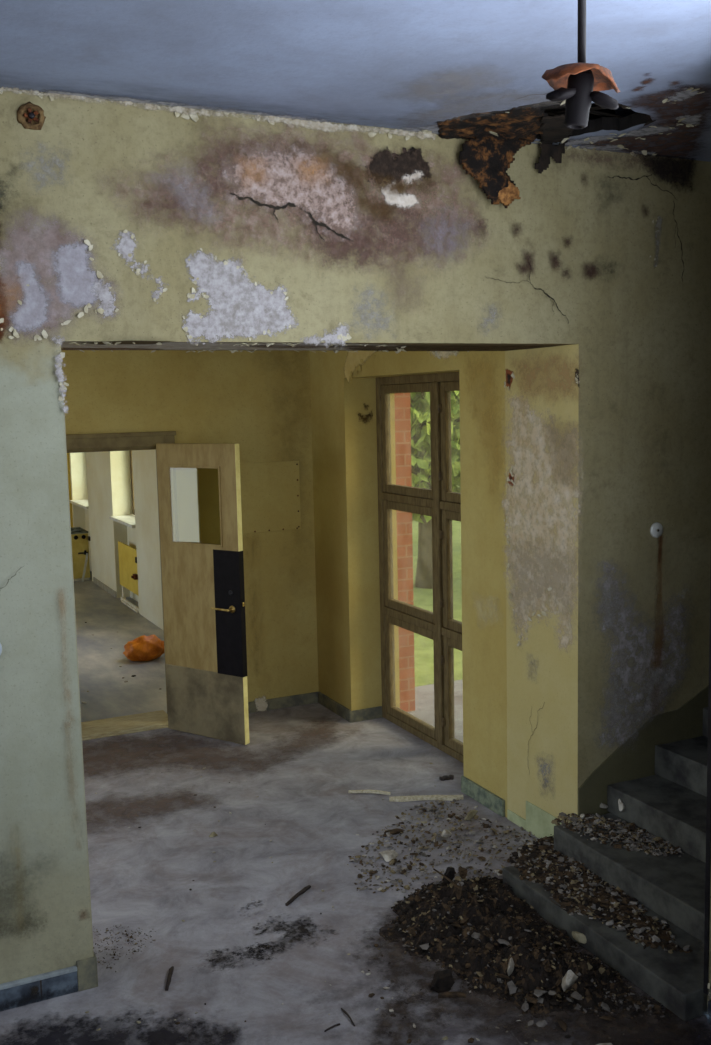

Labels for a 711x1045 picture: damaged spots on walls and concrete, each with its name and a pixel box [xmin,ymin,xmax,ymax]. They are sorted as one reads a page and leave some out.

spalling [0,86,439,208]
crack [231,193,353,242]
corrosion [0,281,8,339]
peeling [0,213,407,413]
peeling [427,351,458,359]
crack [486,271,569,323]
peeling [502,357,580,648]
water stain [598,562,688,746]